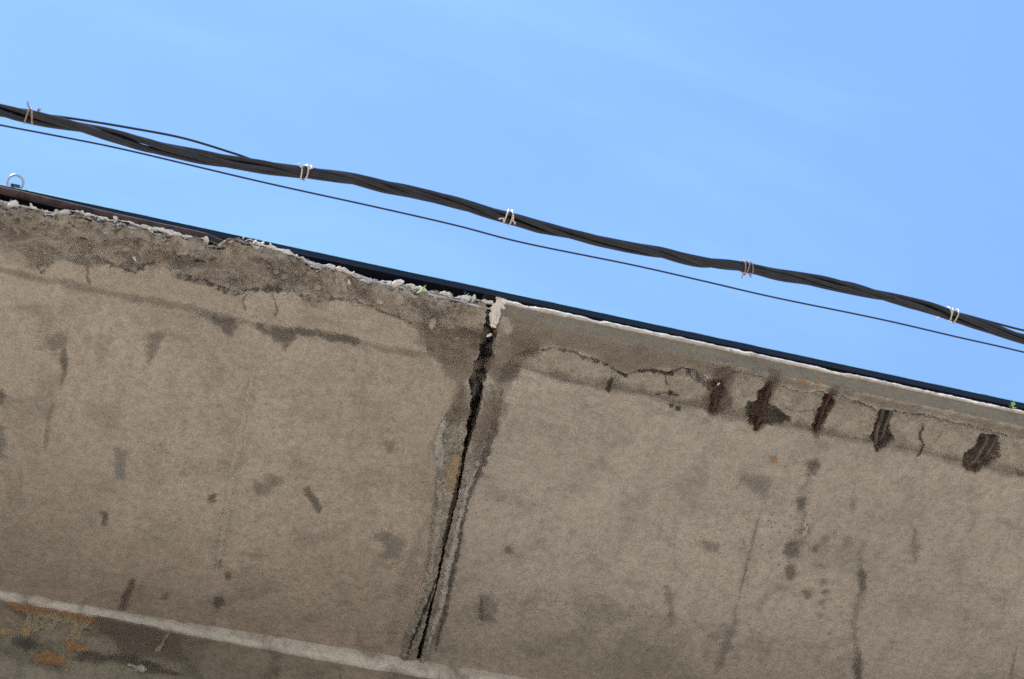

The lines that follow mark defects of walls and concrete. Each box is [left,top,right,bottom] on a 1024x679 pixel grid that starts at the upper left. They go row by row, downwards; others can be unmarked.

spalling [0,199,493,361]
damp [257,324,358,347]
damp [423,297,733,420]
crack [543,348,726,411]
corrosion [797,379,840,437]
crack [851,402,1004,457]
crack [407,294,496,656]
damp [784,498,808,580]